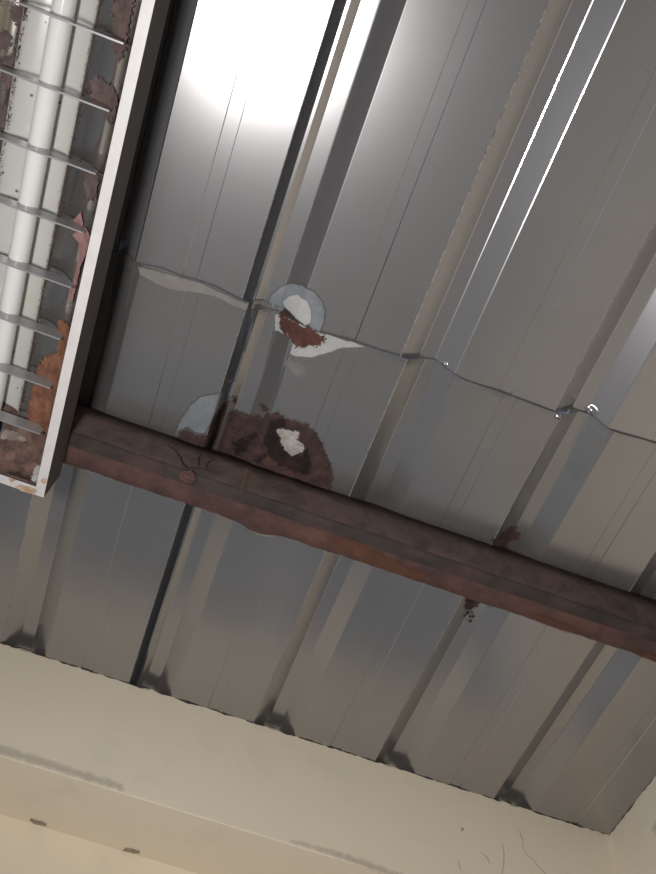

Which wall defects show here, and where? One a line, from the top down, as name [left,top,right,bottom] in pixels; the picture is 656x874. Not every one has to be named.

corrosion [0,0,30,183]
corrosion [18,0,135,434]
corrosion [278,306,327,349]
corrosion [177,395,334,490]
corrosion [329,537,429,581]
corrosion [464,598,492,623]
corrosion [531,613,580,634]